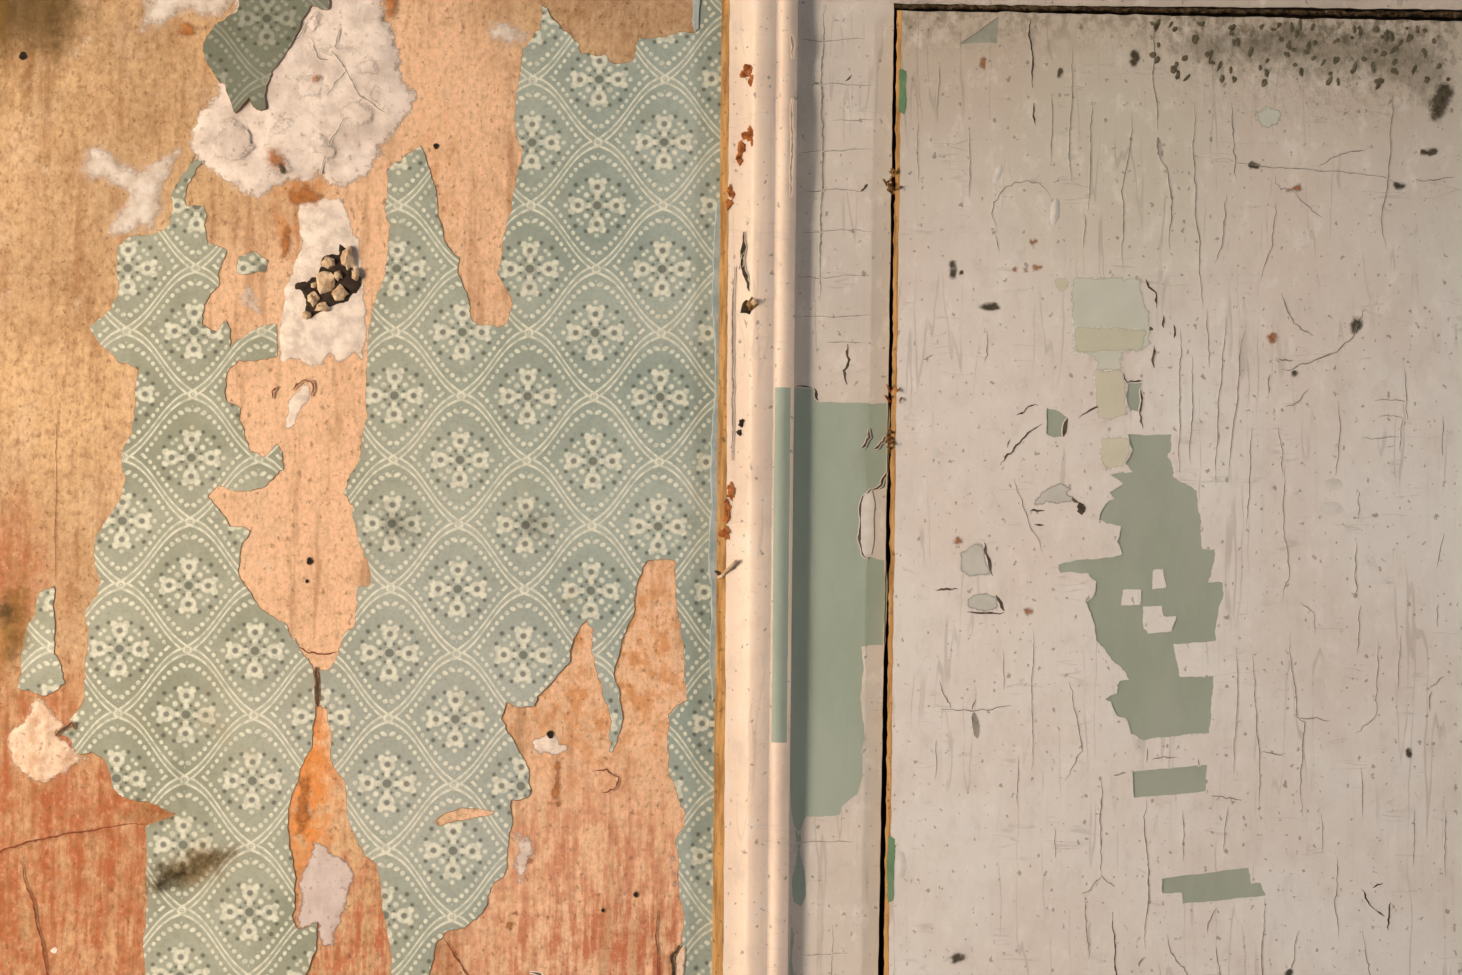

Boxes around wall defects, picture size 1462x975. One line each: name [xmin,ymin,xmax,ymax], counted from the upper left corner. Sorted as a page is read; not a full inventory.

rust [726,185,736,210]
rust [735,125,753,166]
rust [739,64,754,87]
crack [789,5,874,402]
leakage [1130,19,1237,83]
leakage [1228,19,1453,120]
peeling [0,0,695,975]
crack [915,20,1455,975]
peeling [771,387,890,906]
peeling [1059,434,1223,740]
crack [0,822,144,975]
peeling [1162,868,1265,903]